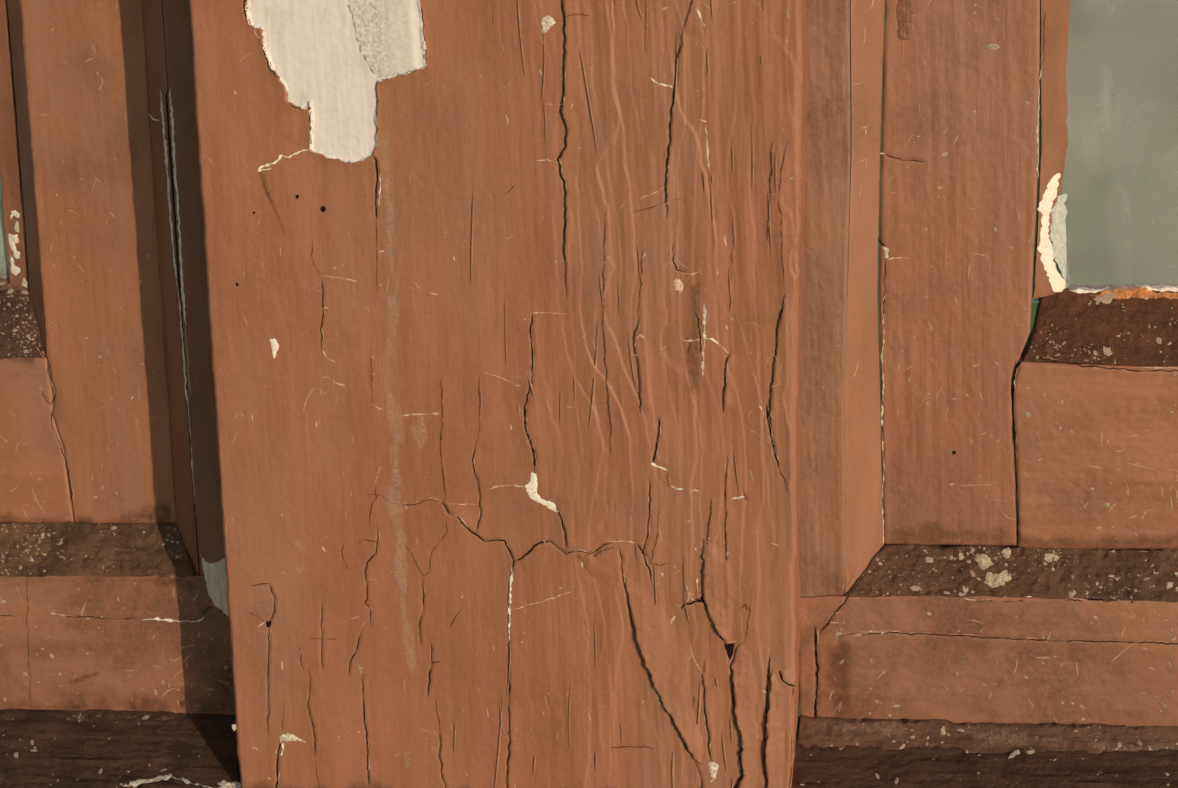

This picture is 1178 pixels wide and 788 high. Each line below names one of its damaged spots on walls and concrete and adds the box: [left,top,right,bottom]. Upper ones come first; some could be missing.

peeling [243,0,427,172]
peeling [1036,13,1109,293]
peeling [8,210,28,288]
peeling [1135,284,1178,292]
crack [34,342,75,521]
peeling [525,472,559,512]
crack [299,1,1178,788]
peeling [200,554,228,616]
crack [249,583,276,735]